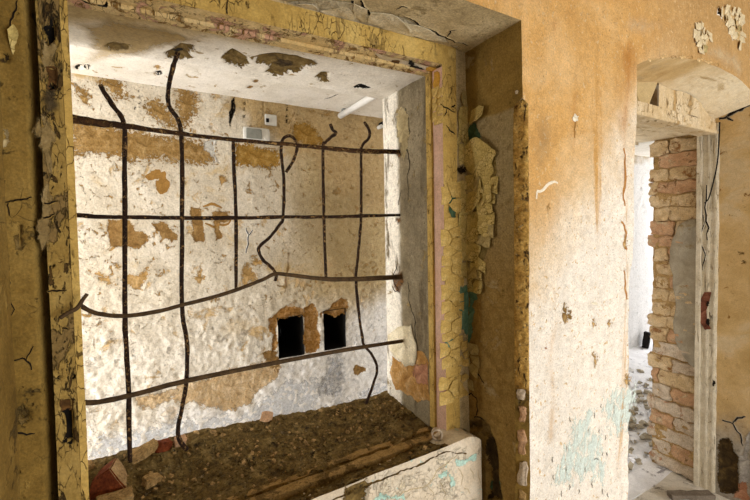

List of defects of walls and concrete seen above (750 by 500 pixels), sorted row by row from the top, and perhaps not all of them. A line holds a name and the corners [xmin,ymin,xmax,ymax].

crack [350,0,371,15]
crack [395,5,468,46]
flaking render [222,48,331,82]
flaking render [73,88,220,194]
flaking render [106,219,148,249]
peeling [438,90,499,406]
flaking render [647,135,697,481]
flaking render [135,297,348,411]
flaking render [388,325,430,403]
crack [722,416,745,446]
crack [394,455,481,500]
flaking render [717,432,750,500]